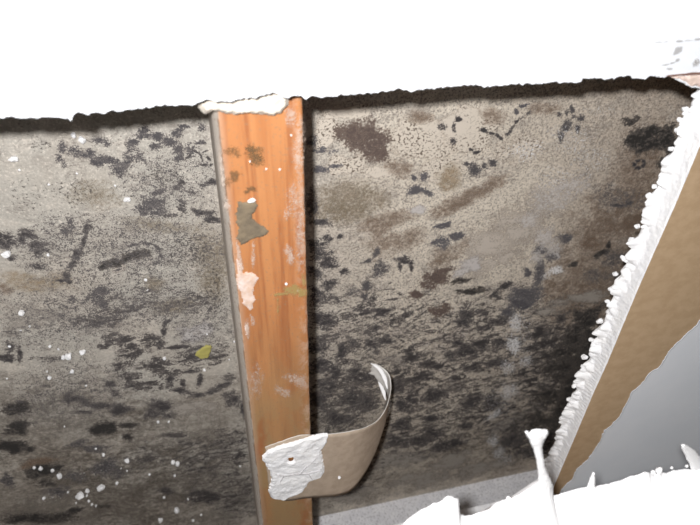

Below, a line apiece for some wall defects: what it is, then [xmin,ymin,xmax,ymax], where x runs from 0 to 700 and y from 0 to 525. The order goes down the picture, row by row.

damp [0,123,256,524]
damp [223,145,264,167]
flaking render [236,259,259,310]
damp [273,104,677,497]
peeling [533,287,612,316]
peeling [553,147,700,495]